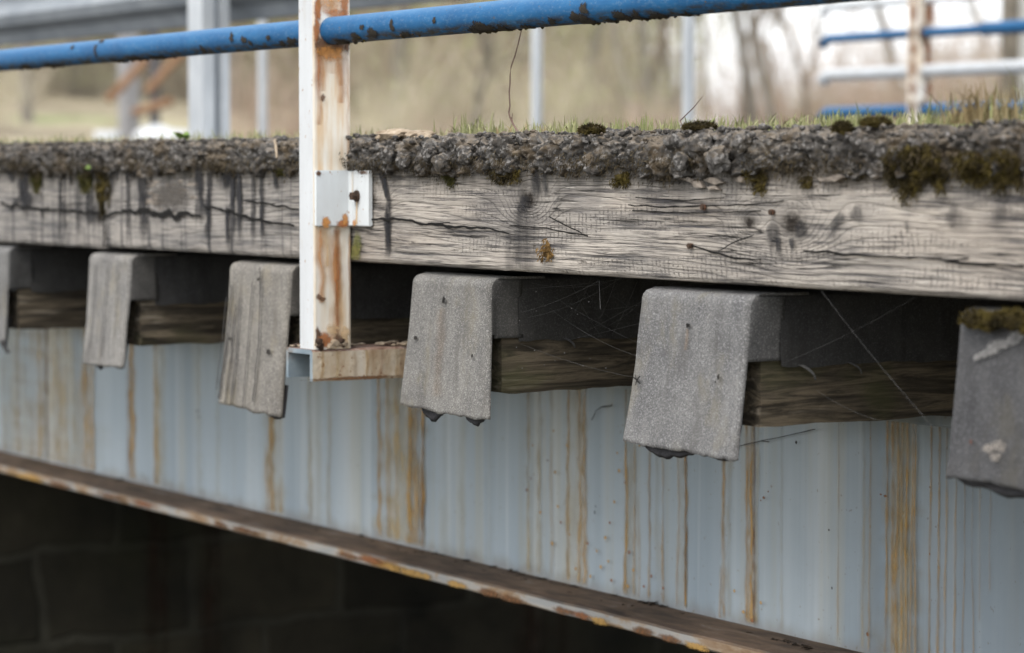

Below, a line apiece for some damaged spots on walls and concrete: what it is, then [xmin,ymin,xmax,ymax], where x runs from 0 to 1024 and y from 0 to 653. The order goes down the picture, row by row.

rust [313,0,350,101]
damp [8,171,31,211]
damp [58,174,97,225]
damp [109,169,147,230]
crack [0,200,299,246]
damp [195,168,277,241]
crack [371,216,588,237]
rust [315,202,357,347]
rust [742,454,762,622]
rust [338,552,431,579]
rust [555,606,606,625]
rust [633,626,707,651]